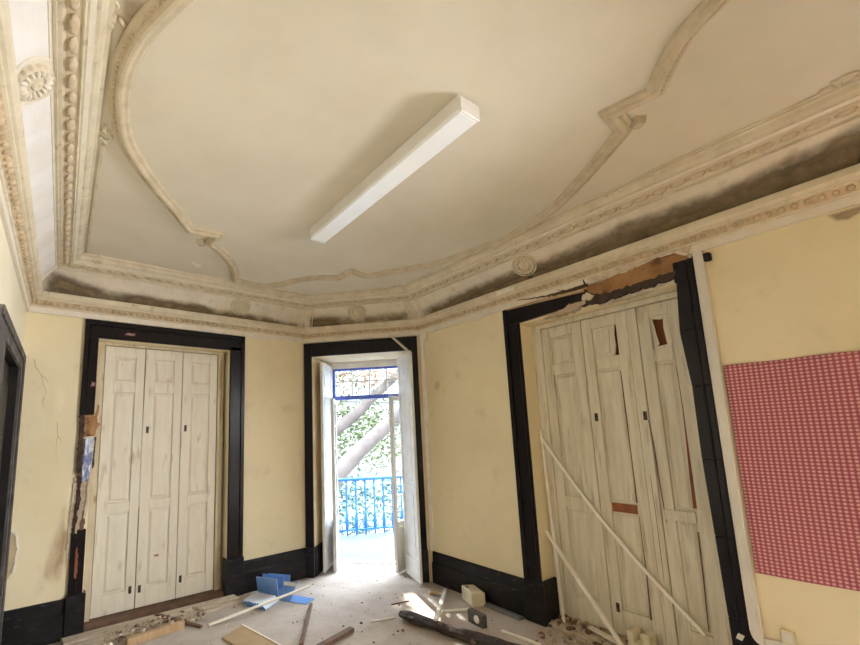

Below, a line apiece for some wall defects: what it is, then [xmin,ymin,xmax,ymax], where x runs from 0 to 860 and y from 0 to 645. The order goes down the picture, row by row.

leakage [48,274,296,326]
spalling [543,245,691,320]
leakage [429,129,860,314]
spalling [66,404,100,579]